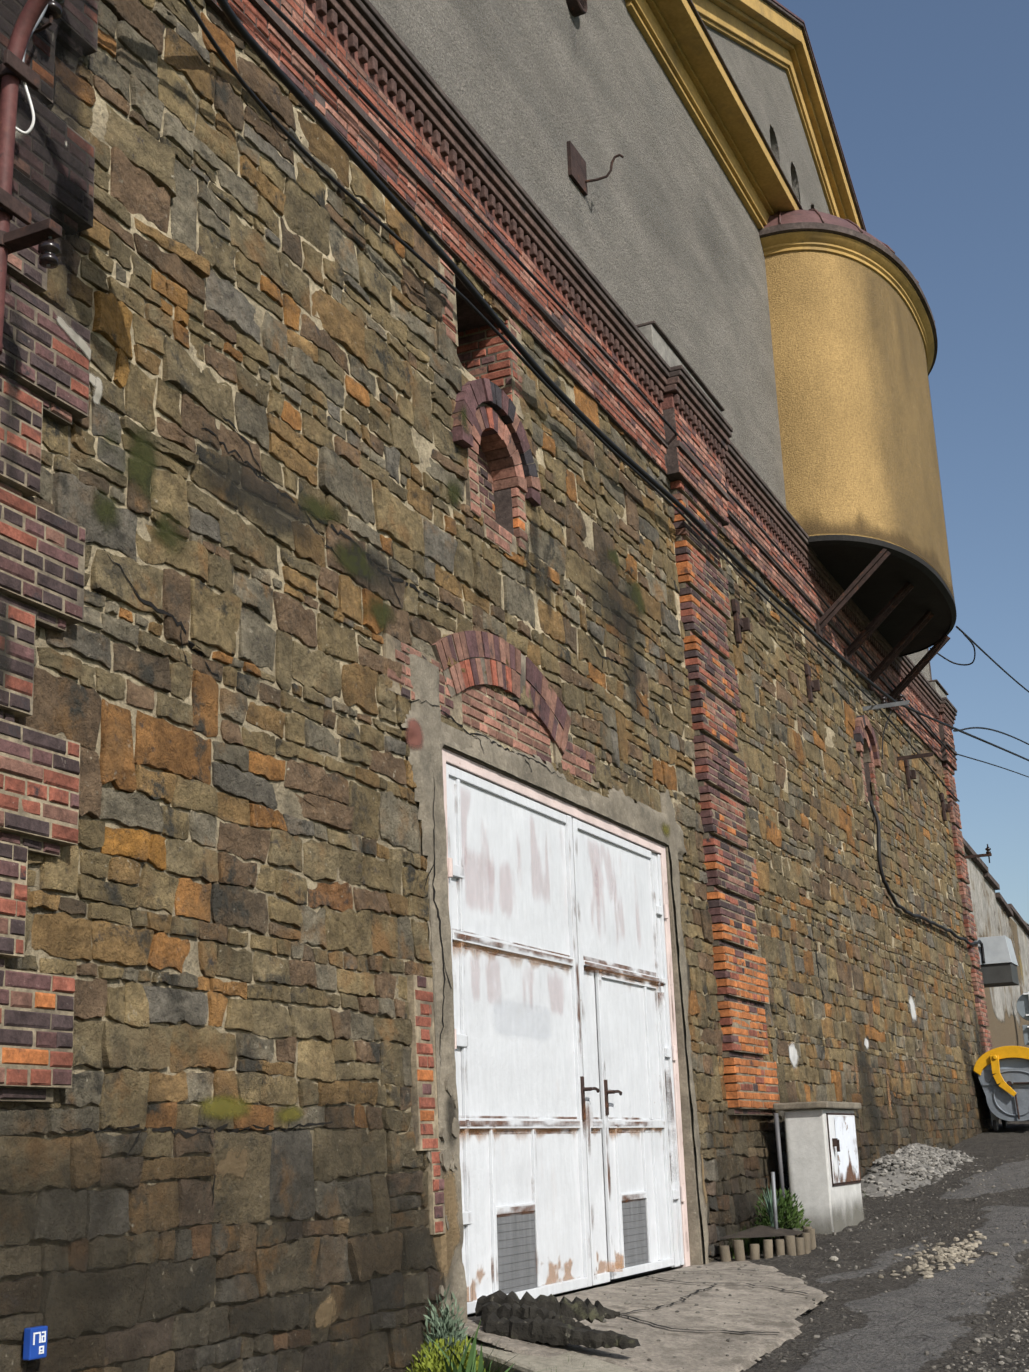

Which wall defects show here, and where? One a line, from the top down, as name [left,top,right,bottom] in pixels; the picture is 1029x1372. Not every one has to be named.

leakage [207,458,303,530]
leakage [350,545,389,582]
crack [424,775,452,1064]
corrosion [497,1206,535,1217]
corrosion [467,1264,494,1302]
corrosion [546,1260,573,1285]
corrosion [596,1253,624,1274]